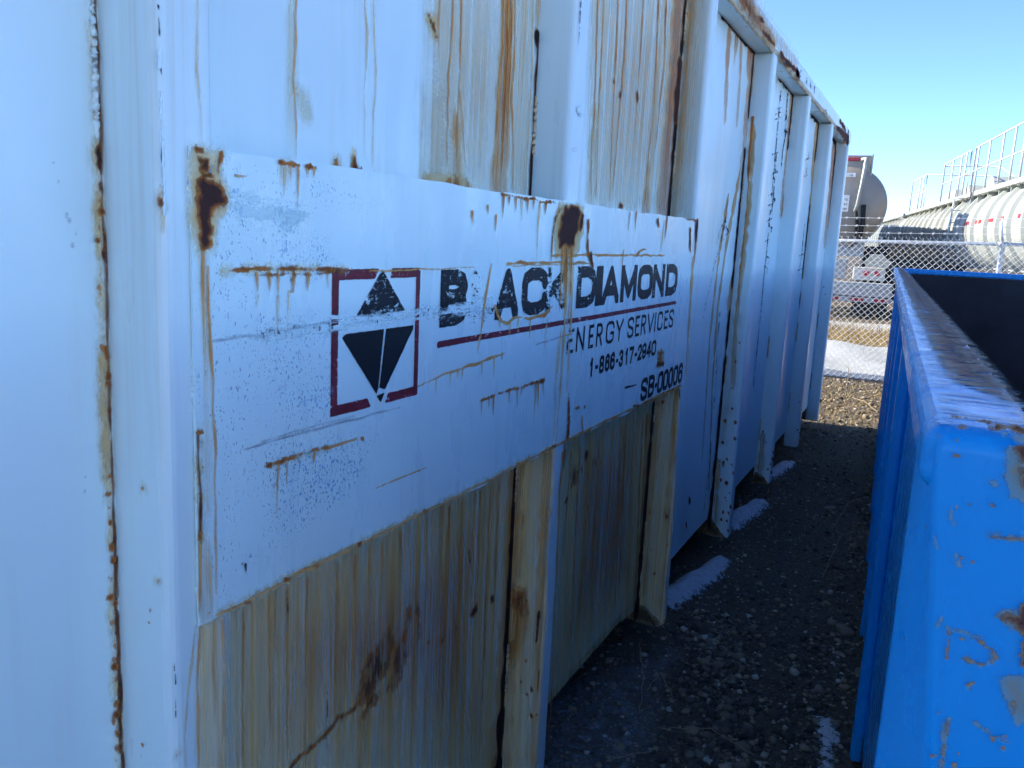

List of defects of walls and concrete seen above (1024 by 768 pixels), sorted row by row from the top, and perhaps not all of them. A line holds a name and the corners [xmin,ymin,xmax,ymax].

corrosion [708,27,756,360]
corrosion [99,344,112,451]
corrosion [190,0,685,768]
corrosion [701,458,734,539]